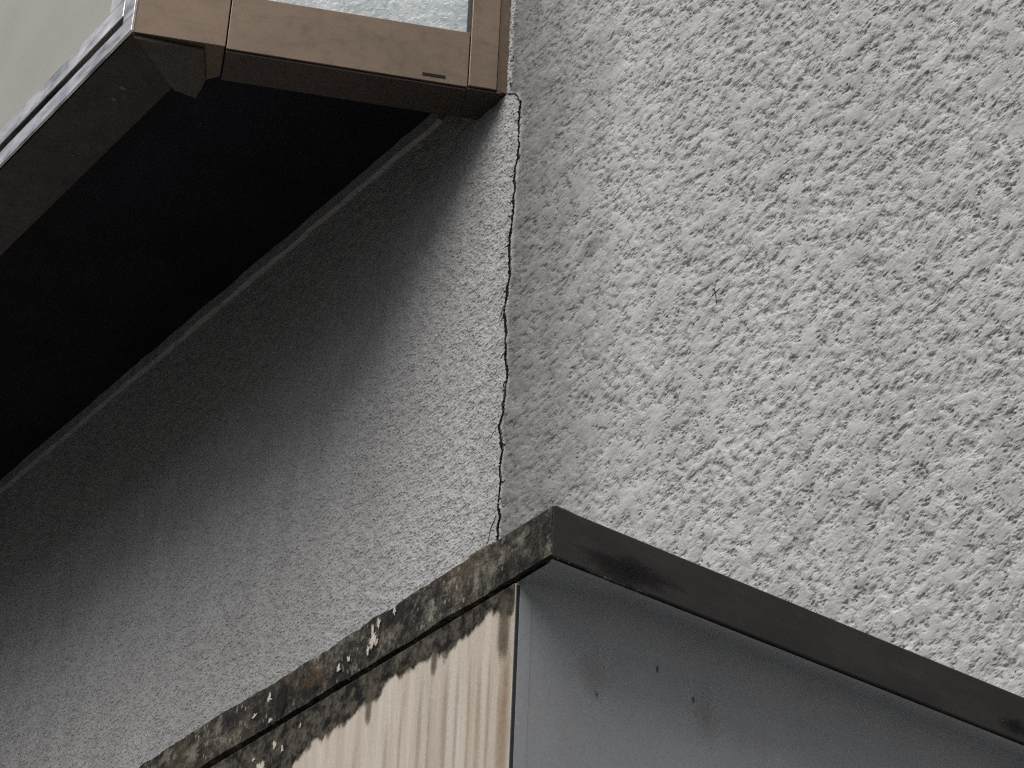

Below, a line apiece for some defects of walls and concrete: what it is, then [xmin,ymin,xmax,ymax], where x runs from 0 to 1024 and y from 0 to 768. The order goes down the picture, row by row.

crack [486,93,522,546]
water stain [210,583,515,768]